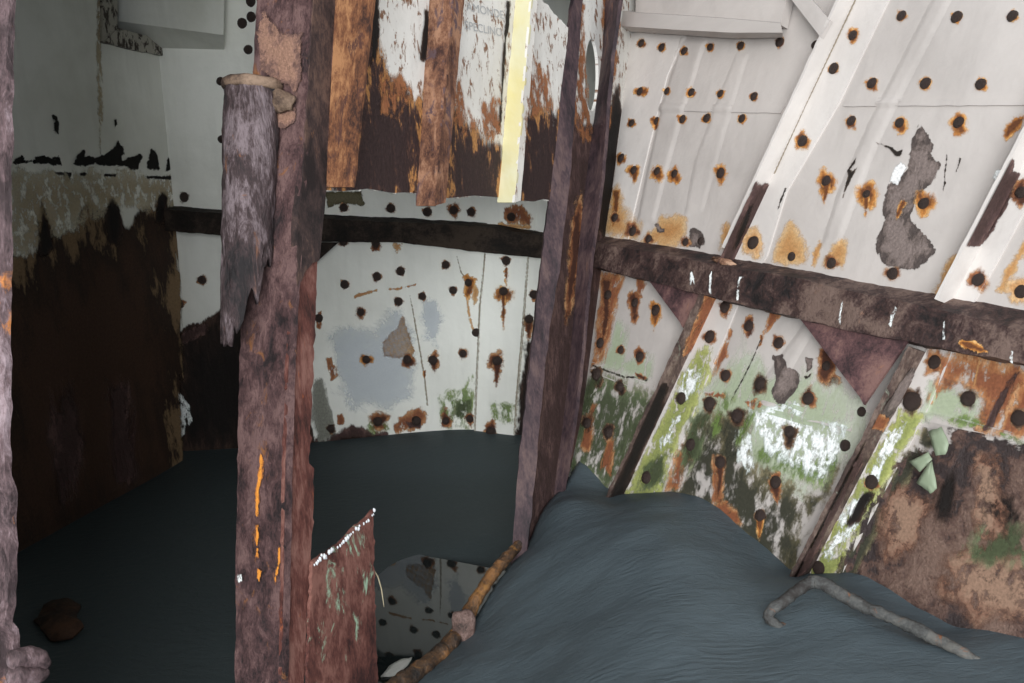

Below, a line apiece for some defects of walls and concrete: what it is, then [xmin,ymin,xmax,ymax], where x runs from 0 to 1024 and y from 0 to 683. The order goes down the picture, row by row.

corrosion [420,9,429,62]
peeling [13,141,170,172]
leakage [12,167,174,255]
corrosion [277,0,424,286]
corrosion [498,59,560,229]
corrosion [717,182,848,269]
corrosion [816,166,836,204]
peeling [876,127,941,270]
corrosion [529,3,693,540]
peeling [382,316,415,359]
corrosion [903,339,1024,439]
corrosion [711,454,742,526]